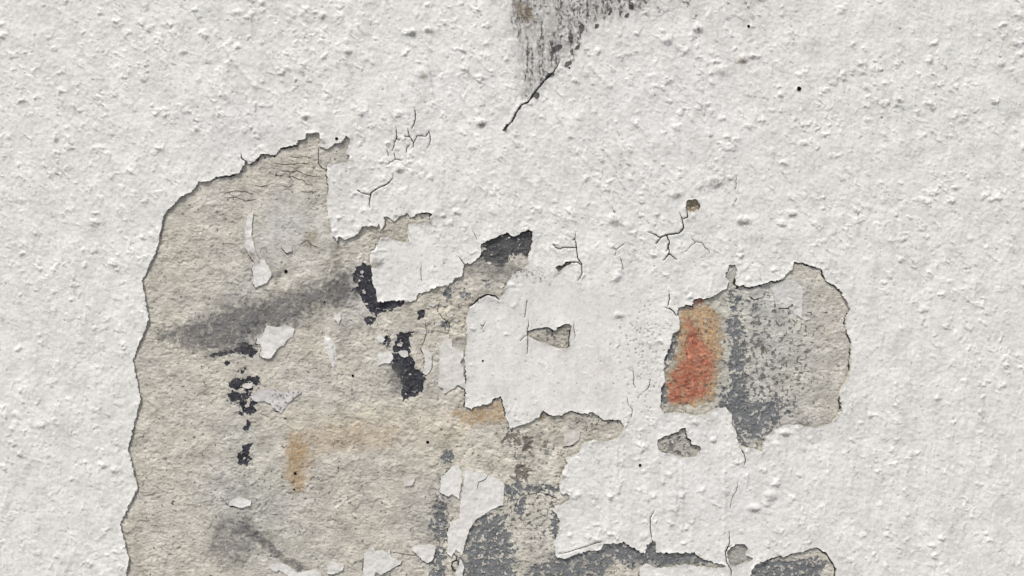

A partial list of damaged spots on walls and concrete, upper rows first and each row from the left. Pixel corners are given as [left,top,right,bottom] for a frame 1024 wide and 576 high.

crack [503,2,634,131]
water stain [511,0,659,97]
crack [357,111,431,206]
crack [648,213,710,260]
peeling [120,132,852,576]
corrosion [667,299,722,407]